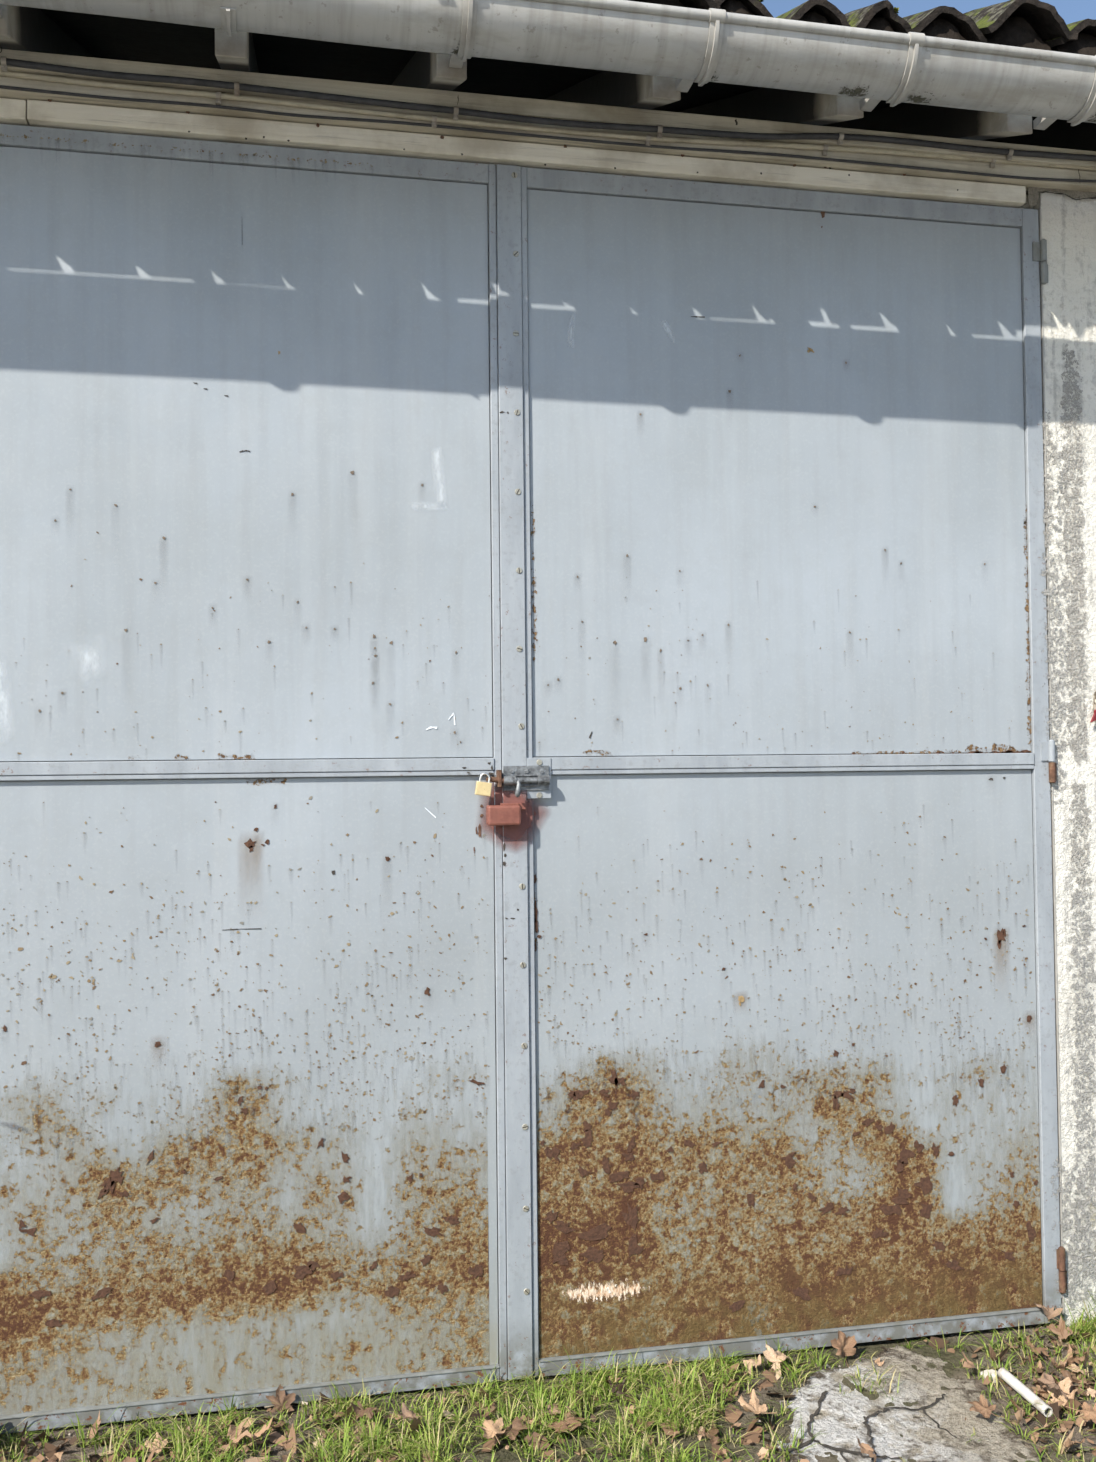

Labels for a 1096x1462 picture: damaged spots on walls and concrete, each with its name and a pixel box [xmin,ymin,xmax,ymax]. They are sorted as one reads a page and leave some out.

corrosion [849,509,1032,754]
peeling [1042,344,1096,887]
corrosion [0,802,490,1414]
corrosion [534,831,1042,1358]
crack [785,1391,957,1462]